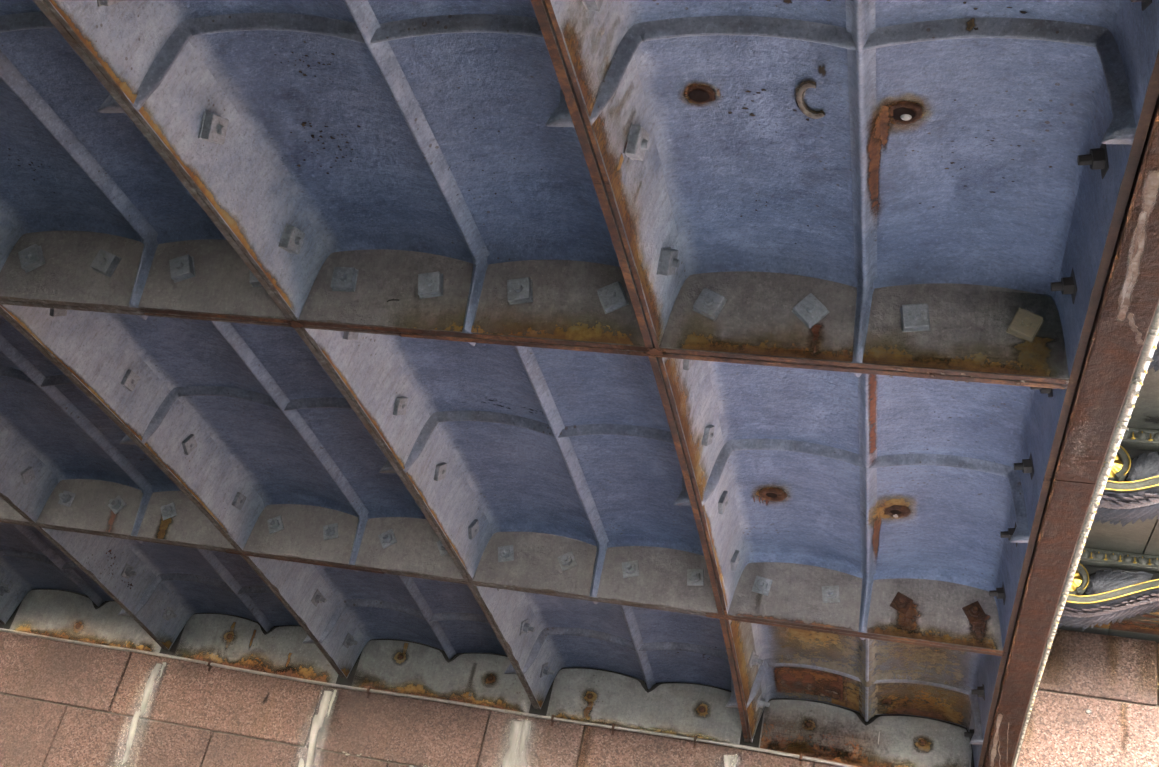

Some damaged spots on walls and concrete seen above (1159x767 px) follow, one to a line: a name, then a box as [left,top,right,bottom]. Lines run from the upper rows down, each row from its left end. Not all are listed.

rust [563,21,662,344]
rust [1127,109,1159,218]
rust [398,316,637,345]
rust [1036,242,1121,547]
rust [665,324,1056,767]
damp [118,662,166,767]
rust [555,690,730,762]